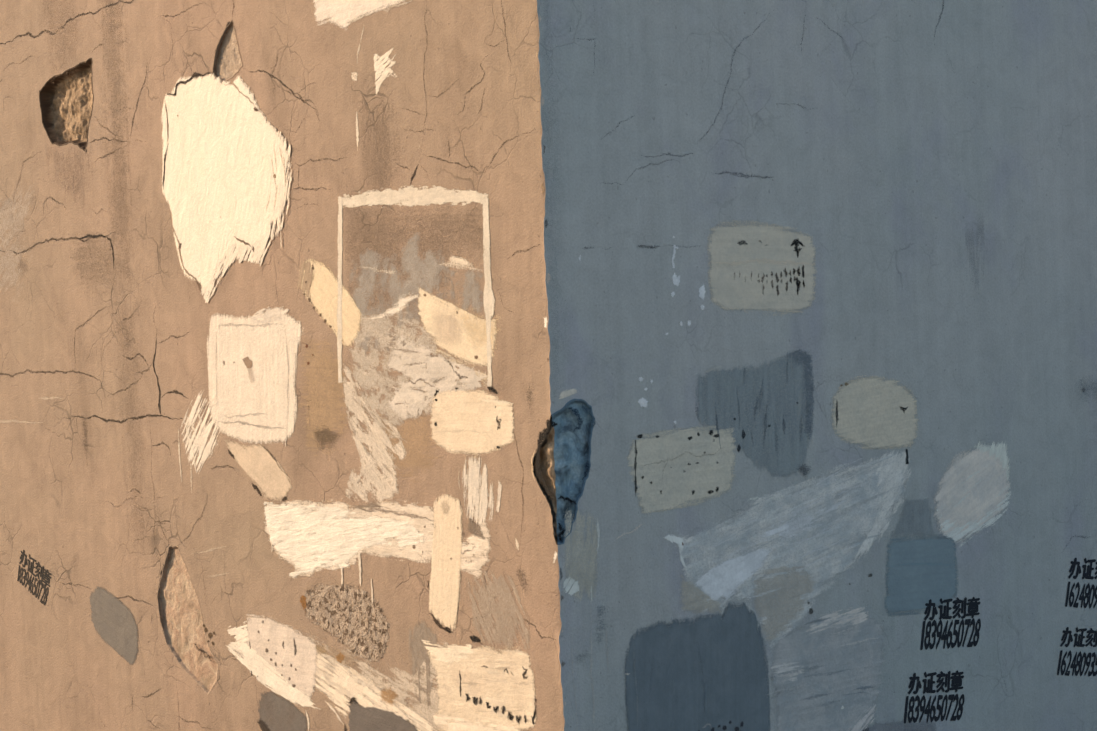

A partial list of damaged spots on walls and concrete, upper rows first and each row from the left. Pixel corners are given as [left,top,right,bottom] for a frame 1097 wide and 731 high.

flaking render [39,58,94,151]
crack [0,0,134,118]
flaking render [212,20,243,82]
crack [395,2,533,183]
crack [605,10,774,185]
crack [3,197,128,268]
crack [85,56,319,292]
crack [297,157,346,208]
crack [0,308,232,604]
spalling [531,399,596,545]
crack [132,685,208,731]